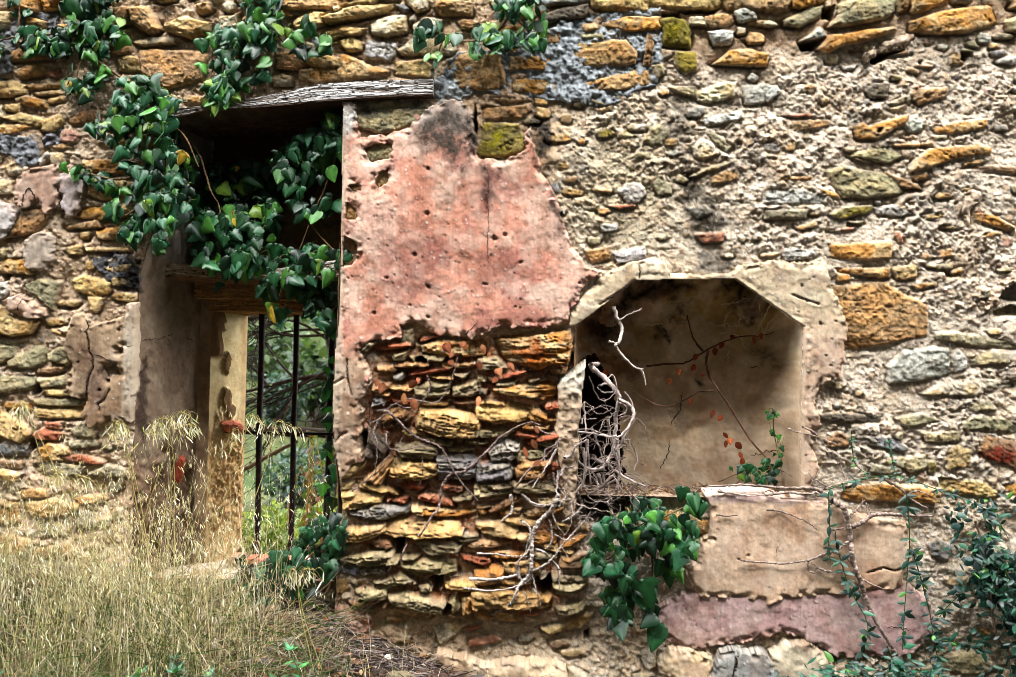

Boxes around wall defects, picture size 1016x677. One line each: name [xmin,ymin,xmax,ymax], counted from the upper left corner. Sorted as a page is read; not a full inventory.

water stain [414,105,477,173]
water stain [479,163,502,209]
crack [78,320,192,407]
flaking render [333,99,937,677]